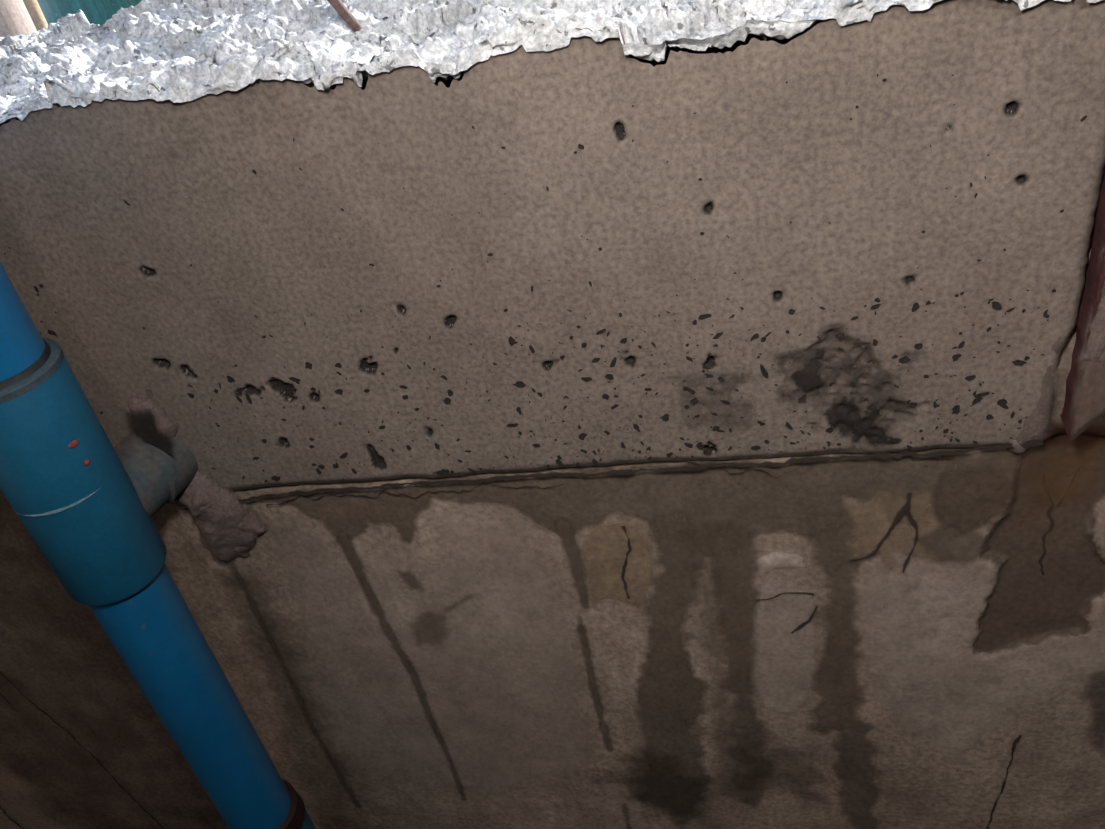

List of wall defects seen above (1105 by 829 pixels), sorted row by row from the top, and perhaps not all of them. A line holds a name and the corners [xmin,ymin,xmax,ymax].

spalling [0,0,942,126]
spalling [1013,0,1071,11]
flaking render [848,366,1105,750]
water stain [258,449,968,829]
crack [0,671,165,829]